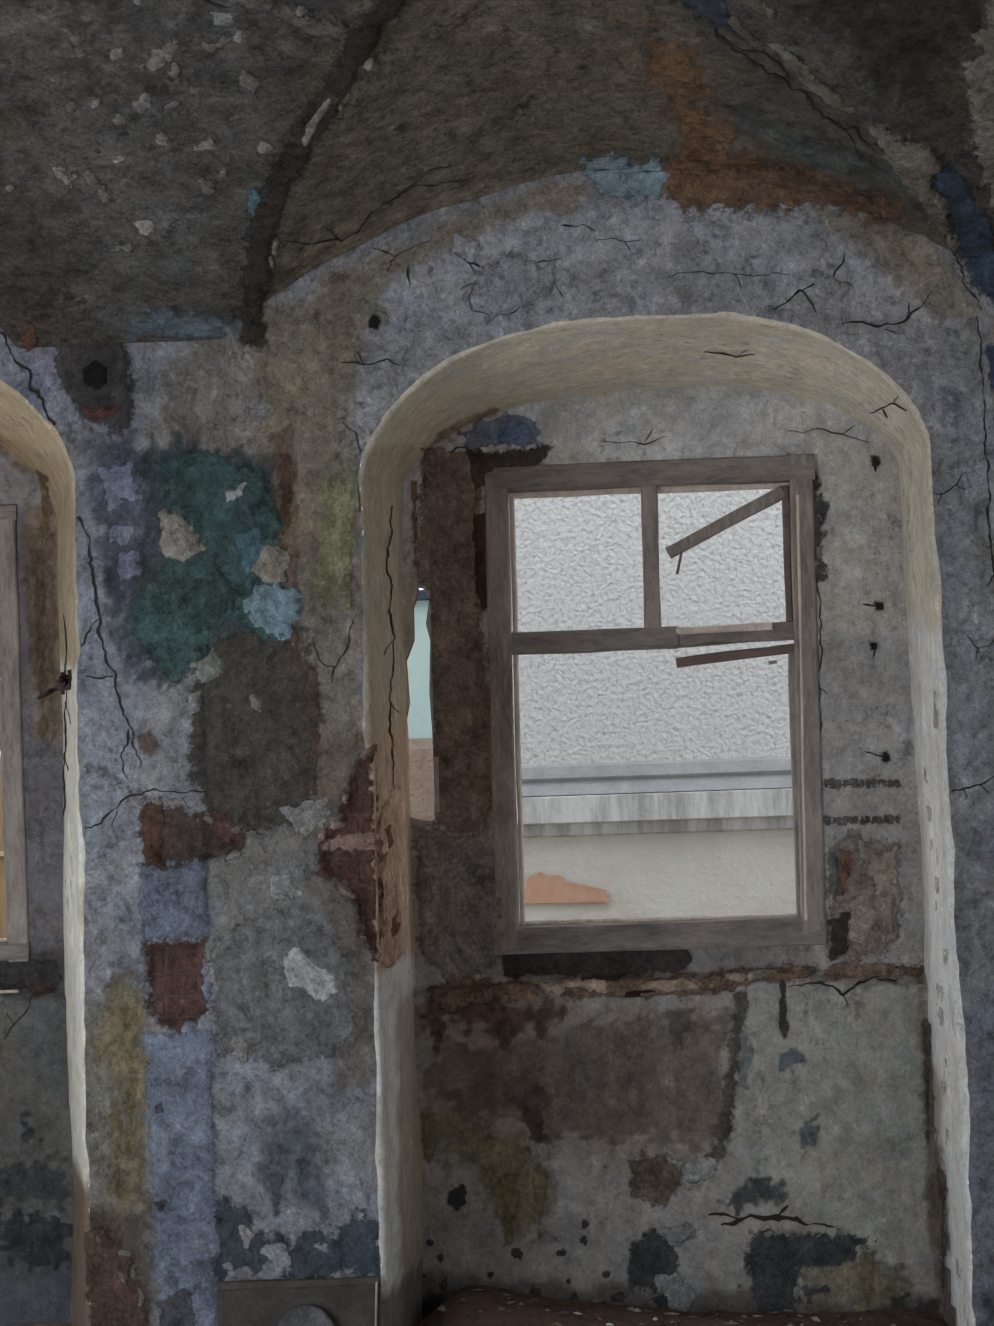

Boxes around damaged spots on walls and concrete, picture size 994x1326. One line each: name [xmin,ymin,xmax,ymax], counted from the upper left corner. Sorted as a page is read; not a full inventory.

peeling [867,0,994,304]
crack [285,164,641,317]
crack [669,223,994,587]
peeling [813,471,830,583]
peeling [35,0,815,1326]
crack [816,582,827,733]
peeling [824,778,902,791]
crack [788,946,922,1005]
spalling [820,814,924,986]
water stain [0,1111,73,1272]
crack [708,1205,834,1228]
spalling [738,1225,877,1313]